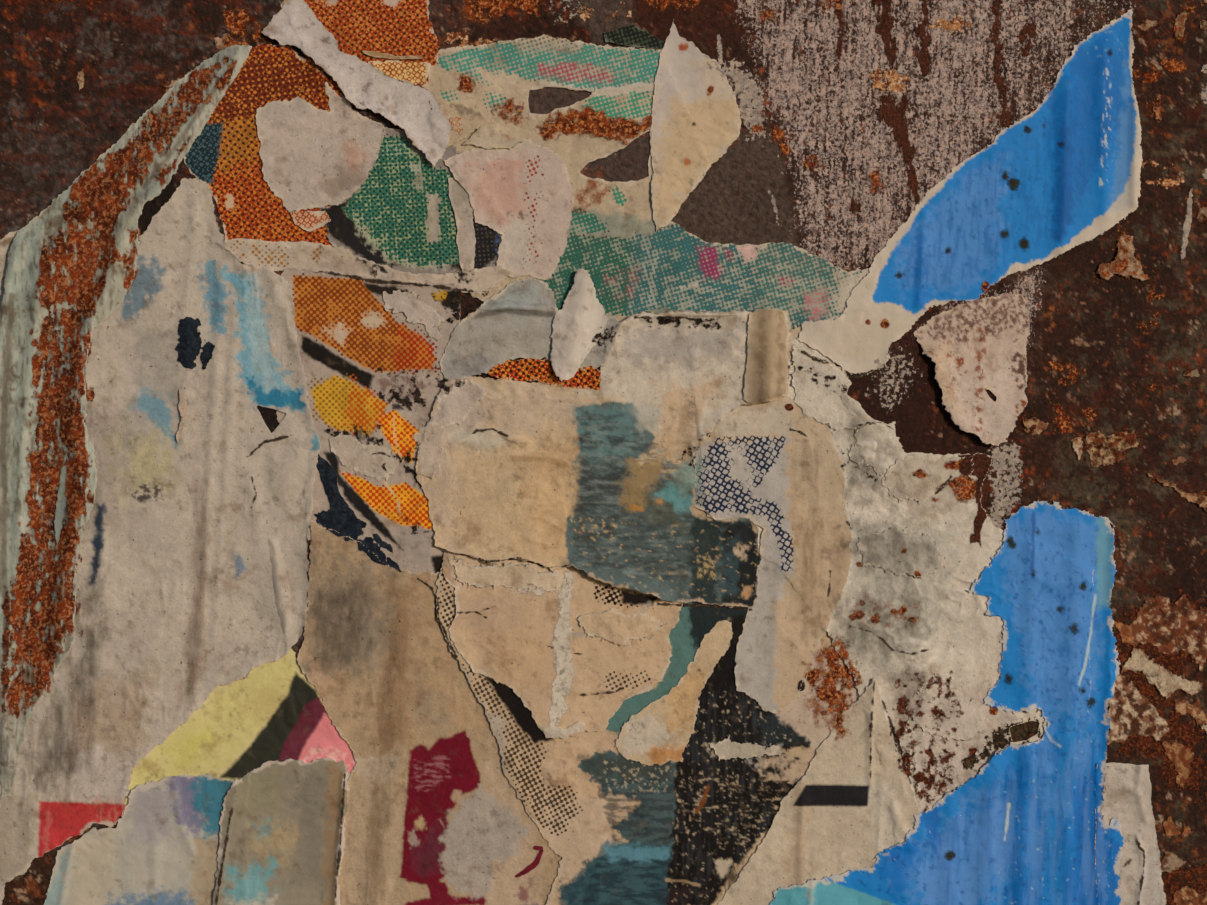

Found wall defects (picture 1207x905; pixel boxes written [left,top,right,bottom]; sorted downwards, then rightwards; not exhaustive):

corrosion [223,7,262,45]
corrosion [458,74,476,93]
corrosion [491,98,524,125]
corrosion [537,106,652,145]
peeling [707,0,1207,271]
corrosion [1142,160,1186,189]
peeling [1096,229,1150,285]
peeling [941,266,1047,350]
corrosion [0,56,237,718]
corrosion [1053,405,1097,433]
peeling [987,413,1049,528]
corrosion [798,636,862,740]